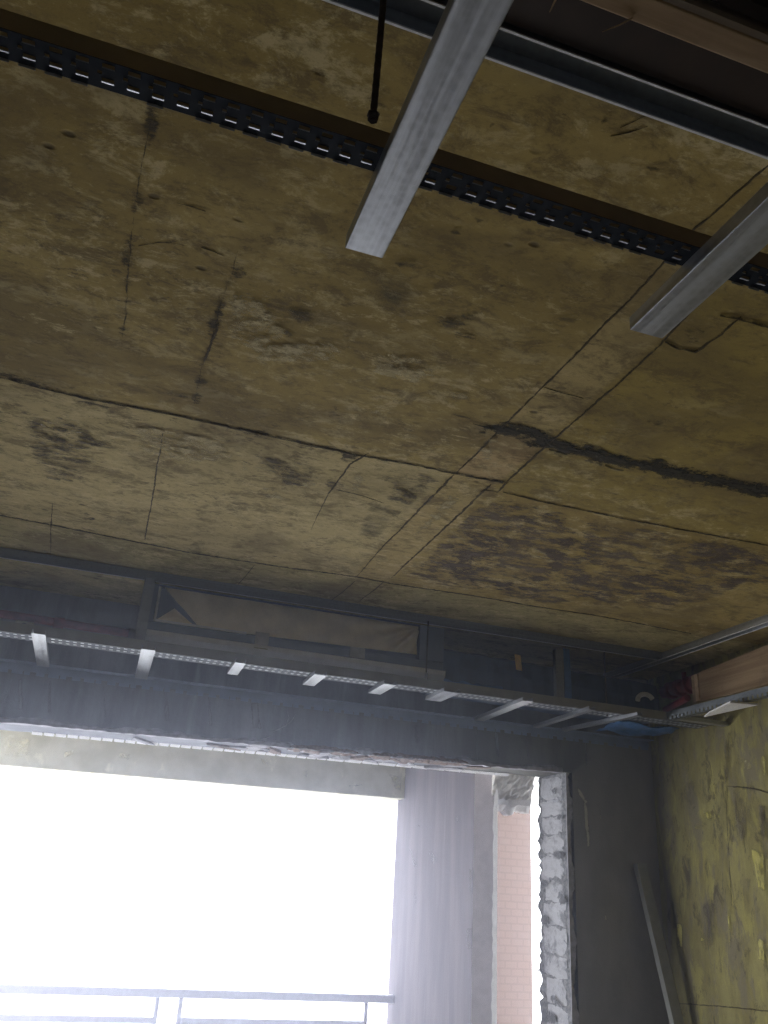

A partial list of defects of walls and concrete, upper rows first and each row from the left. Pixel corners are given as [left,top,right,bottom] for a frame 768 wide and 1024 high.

crack [120,108,245,331]
crack [692,165,768,230]
leakage [31,418,107,481]
crack [0,261,768,634]
leakage [410,503,768,611]
leakage [751,850,765,890]